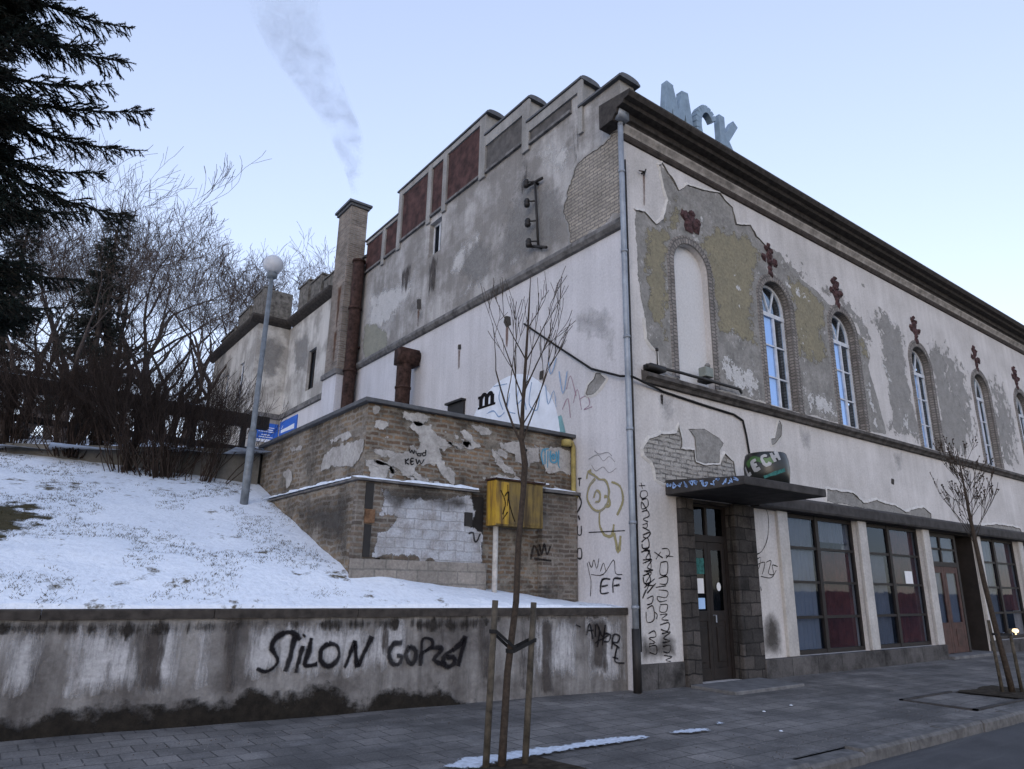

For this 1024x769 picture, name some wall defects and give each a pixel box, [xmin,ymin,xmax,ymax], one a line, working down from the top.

water stain [502,177,557,265]
flaking render [562,129,620,245]
water stain [369,267,422,327]
flaking render [634,161,920,444]
flaking render [926,339,978,457]
peeling [321,405,571,563]
flaking render [640,421,737,487]
flaking render [825,486,932,518]
water stain [0,633,34,690]
water stain [64,630,175,697]
water stain [247,622,405,677]
water stain [521,620,622,693]